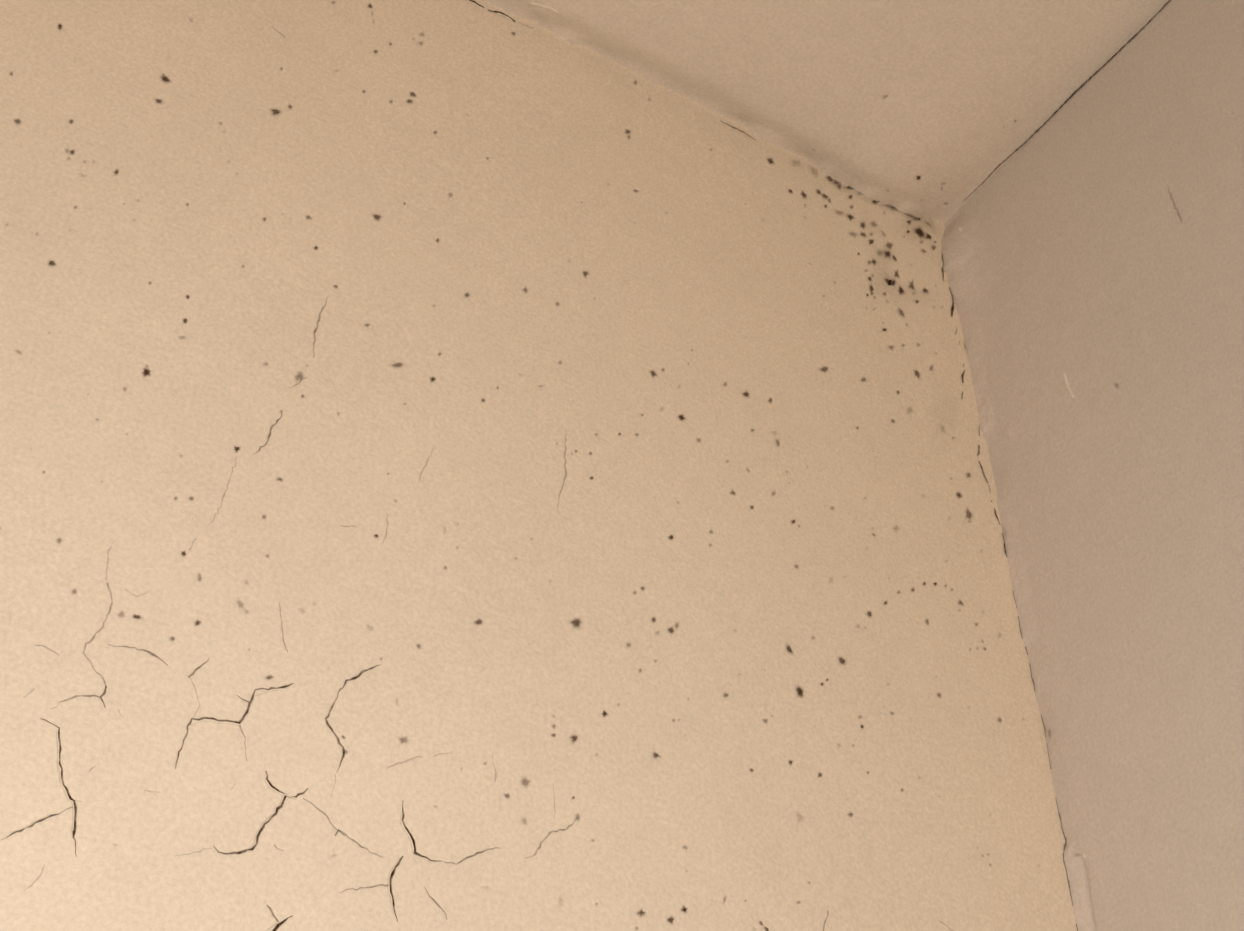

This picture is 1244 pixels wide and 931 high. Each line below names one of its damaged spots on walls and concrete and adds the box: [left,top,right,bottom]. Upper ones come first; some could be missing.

damp [867,244,928,303]
crack [176,684,291,763]
crack [325,667,374,767]
crack [9,719,77,853]
crack [215,777,307,854]
crack [388,806,435,918]
crack [266,906,292,931]